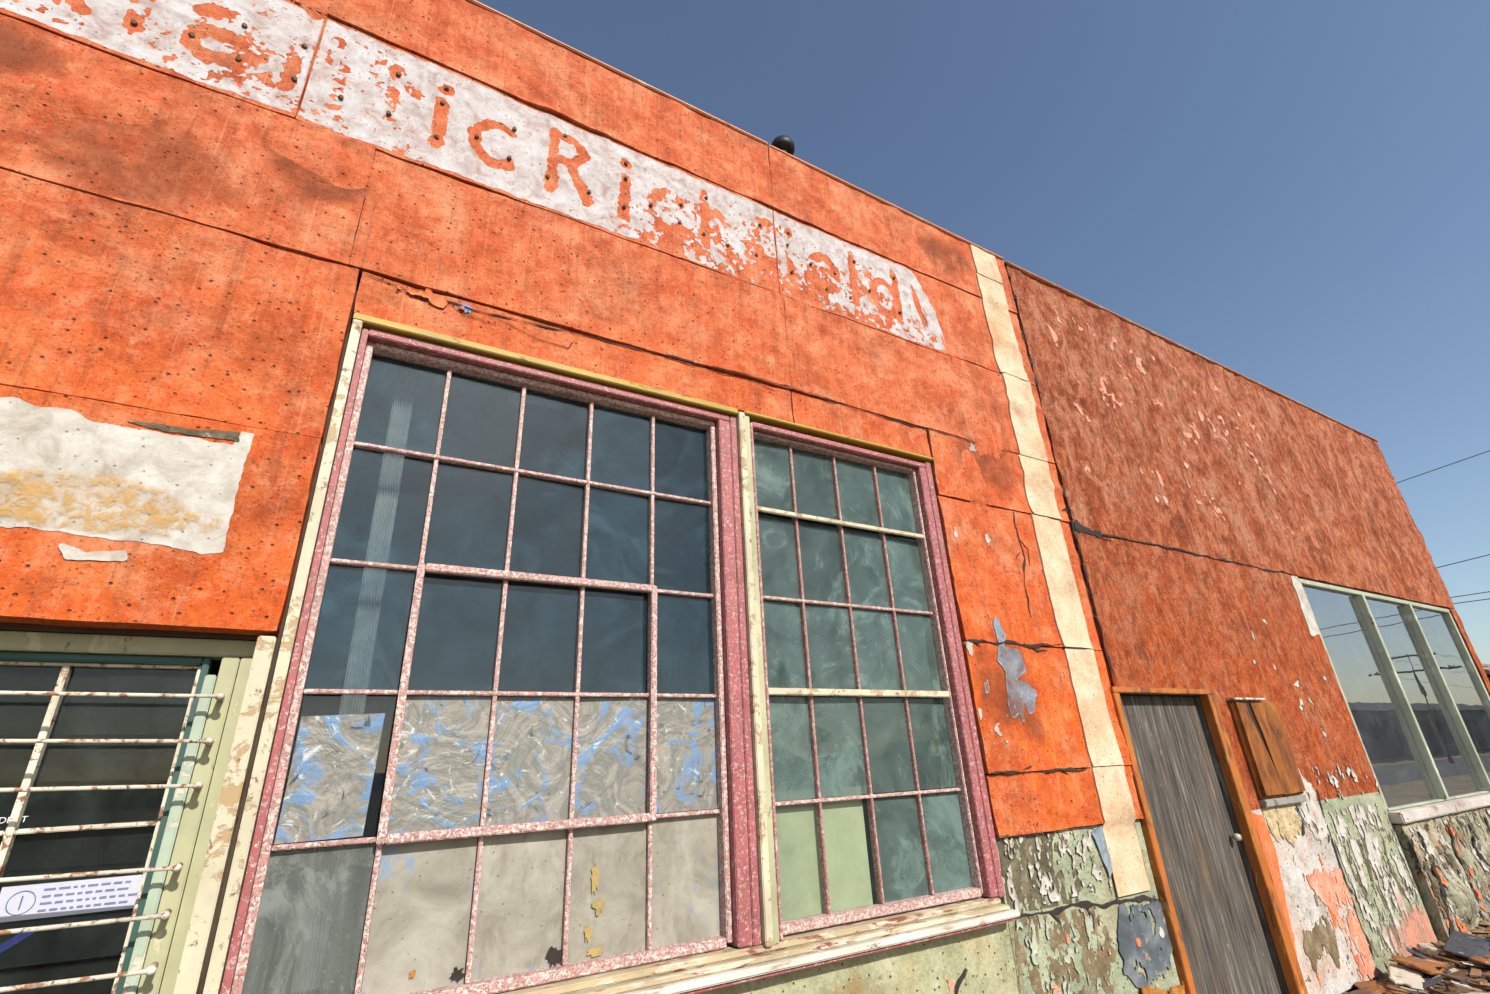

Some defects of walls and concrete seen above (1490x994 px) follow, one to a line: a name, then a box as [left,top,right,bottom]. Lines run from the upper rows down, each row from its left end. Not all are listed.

peeling [397,285,477,313]
peeling [0,397,254,562]
peeling [978,616,1037,744]
spalling [996,826,1185,994]
peeling [1252,764,1490,987]